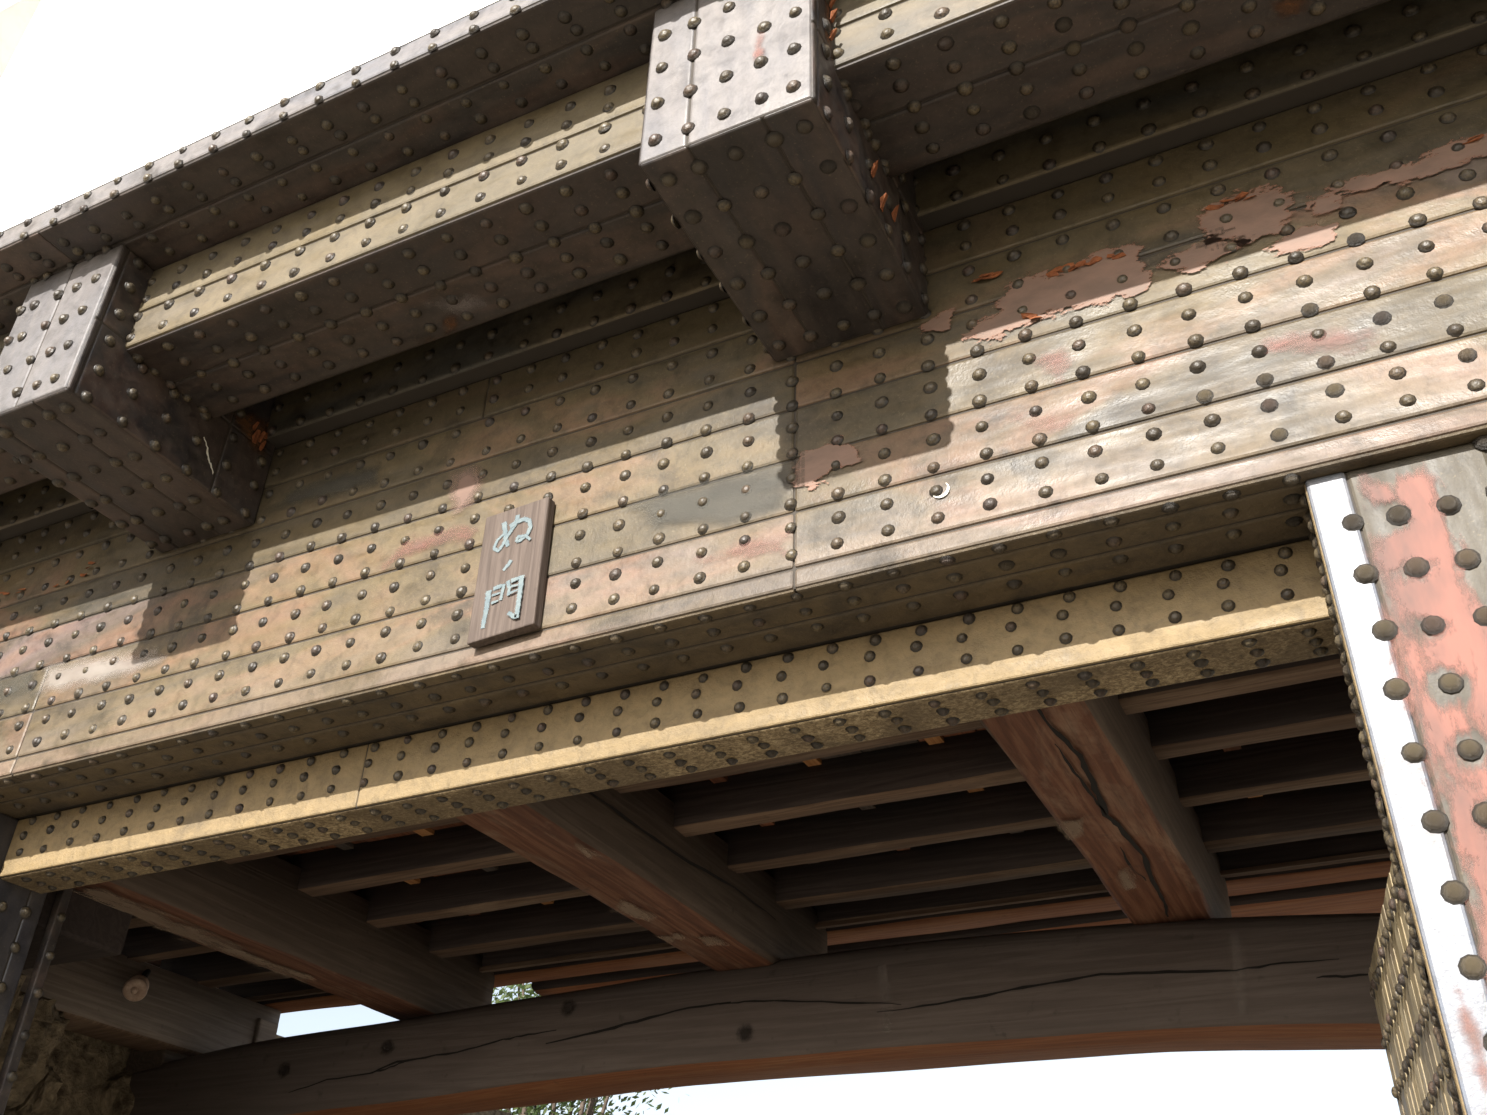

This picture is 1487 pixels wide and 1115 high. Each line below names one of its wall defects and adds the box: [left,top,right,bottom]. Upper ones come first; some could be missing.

peeling [919,133,1487,345]
peeling [791,435,862,490]
crack [1037,709,1169,917]
crack [289,959,1368,1093]